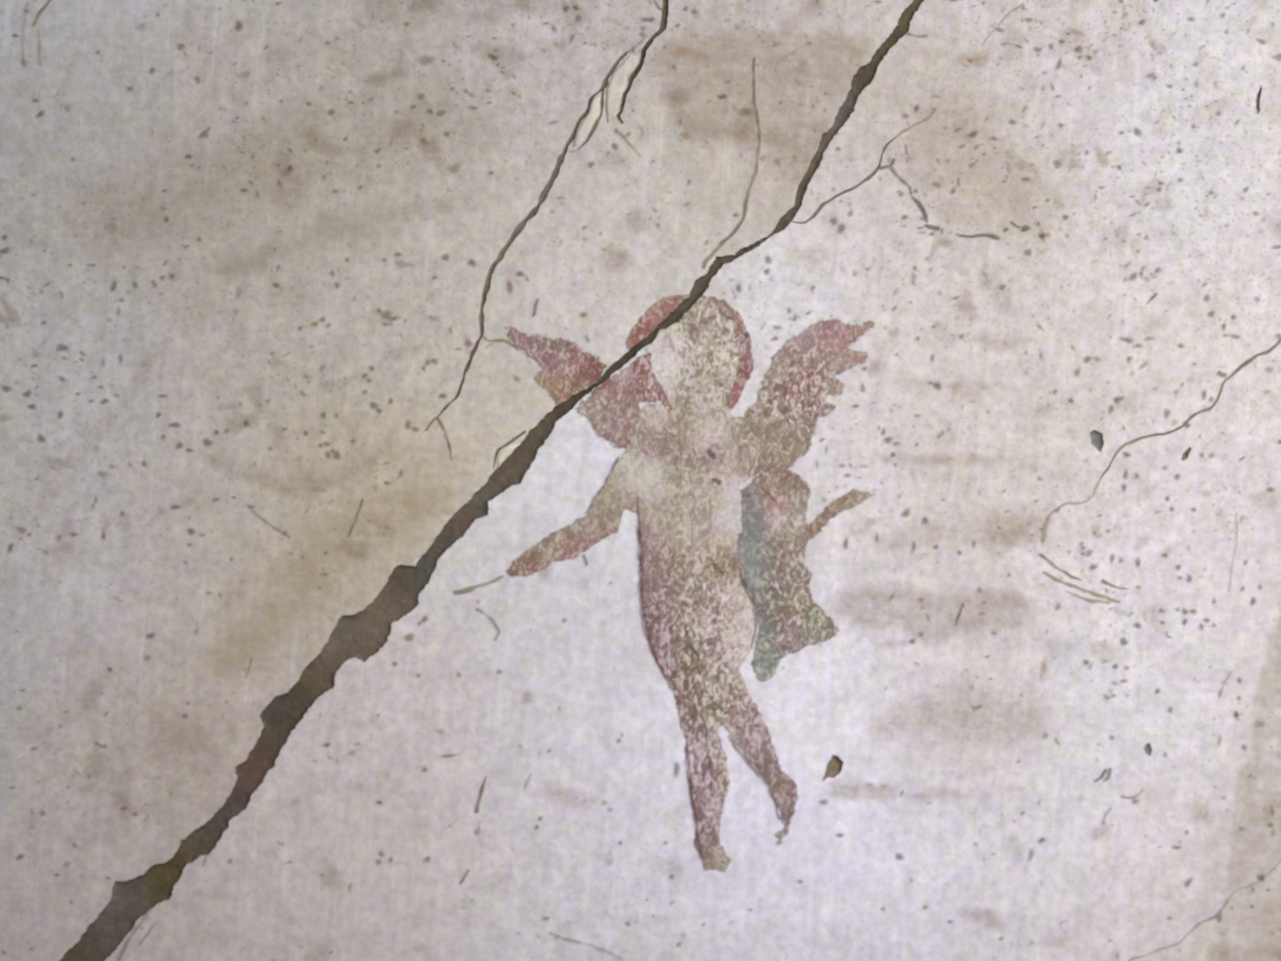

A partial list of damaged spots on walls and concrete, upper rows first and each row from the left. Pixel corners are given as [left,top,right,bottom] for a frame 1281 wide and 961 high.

crack [59,0,1020,961]
crack [1042,333,1281,542]